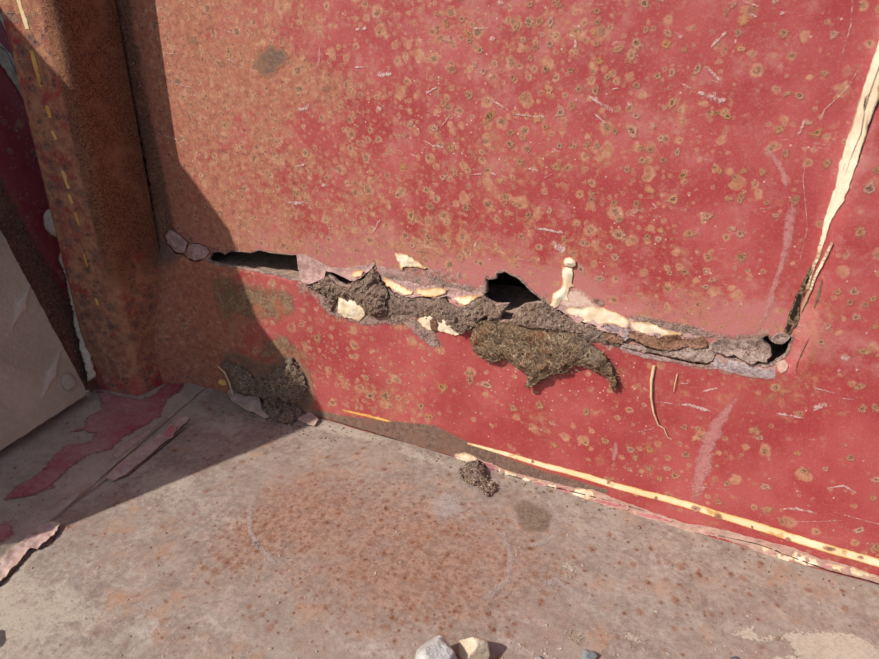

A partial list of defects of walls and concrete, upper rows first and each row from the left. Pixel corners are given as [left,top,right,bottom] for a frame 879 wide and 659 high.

crack [845,67,879,175]
peeling [165,230,210,260]
peeling [395,253,427,269]
peeling [337,297,365,321]
peeling [383,278,481,306]
peeling [417,314,459,336]
peeling [771,332,791,344]
crack [784,267,822,374]
peeling [617,346,788,380]
peeling [6,383,190,500]
corrosion [311,403,611,494]
peeling [0,521,61,581]